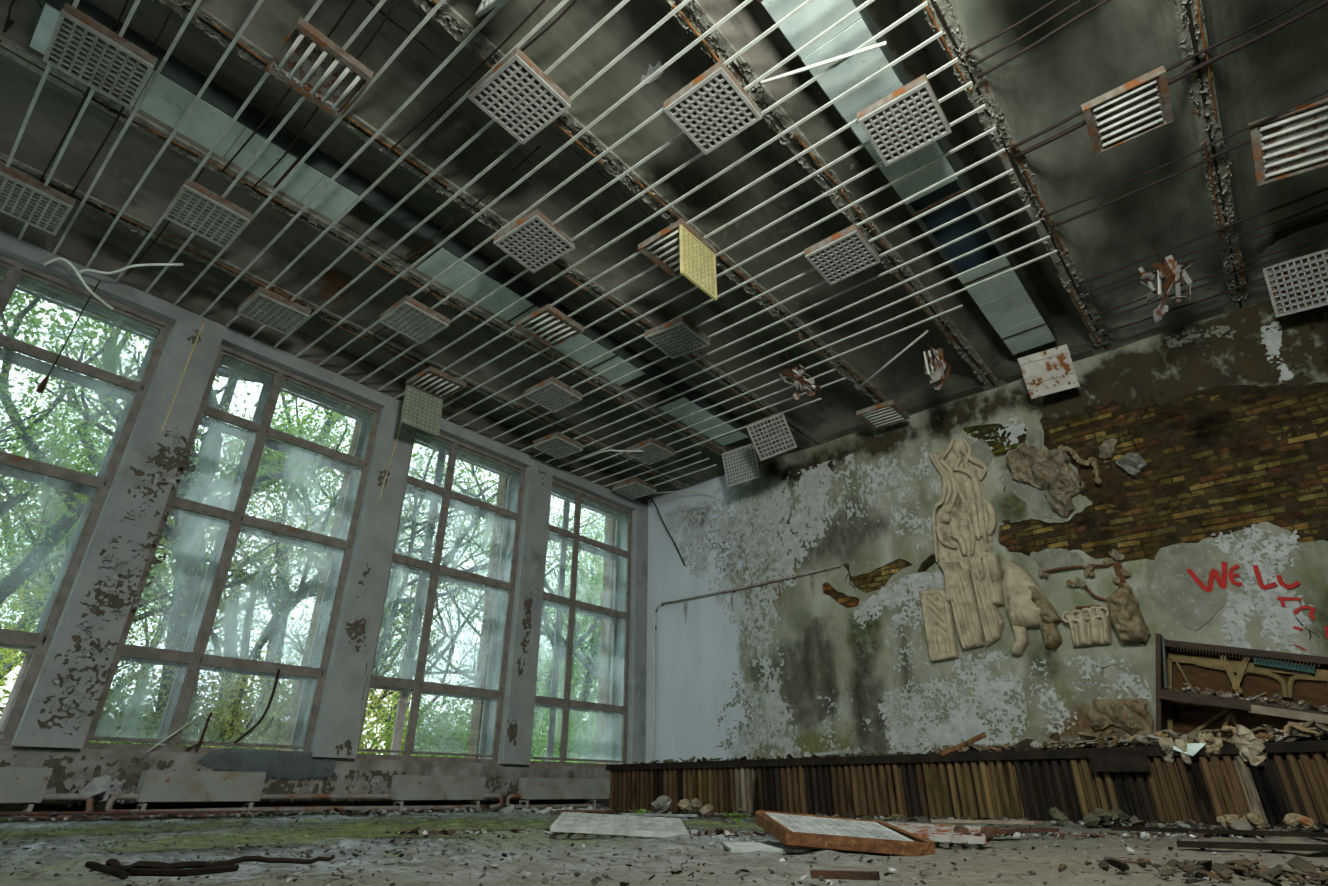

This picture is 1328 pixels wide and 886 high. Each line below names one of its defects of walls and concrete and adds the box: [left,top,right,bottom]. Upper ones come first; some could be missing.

crack [0,0,42,42]
peeling [32,428,196,737]
water stain [752,621,888,758]
peeling [663,441,1152,759]
flaking render [964,322,1328,654]